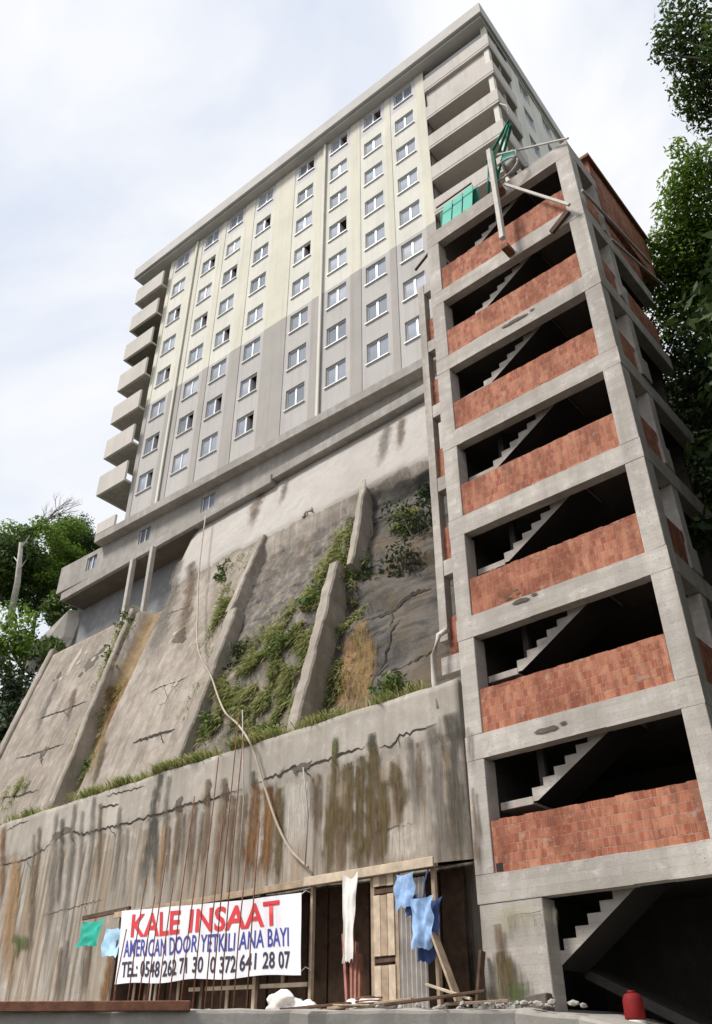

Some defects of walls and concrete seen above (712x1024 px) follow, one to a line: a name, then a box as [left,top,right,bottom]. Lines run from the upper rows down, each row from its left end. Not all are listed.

leakage [378,418,404,458]
crack [329,588,432,697]
spalling [534,721,567,734]
leakage [141,774,234,883]
crack [0,724,435,873]
leakage [282,773,321,850]
leakage [337,713,478,872]
leakage [15,796,102,991]
leakage [99,955,116,1001]